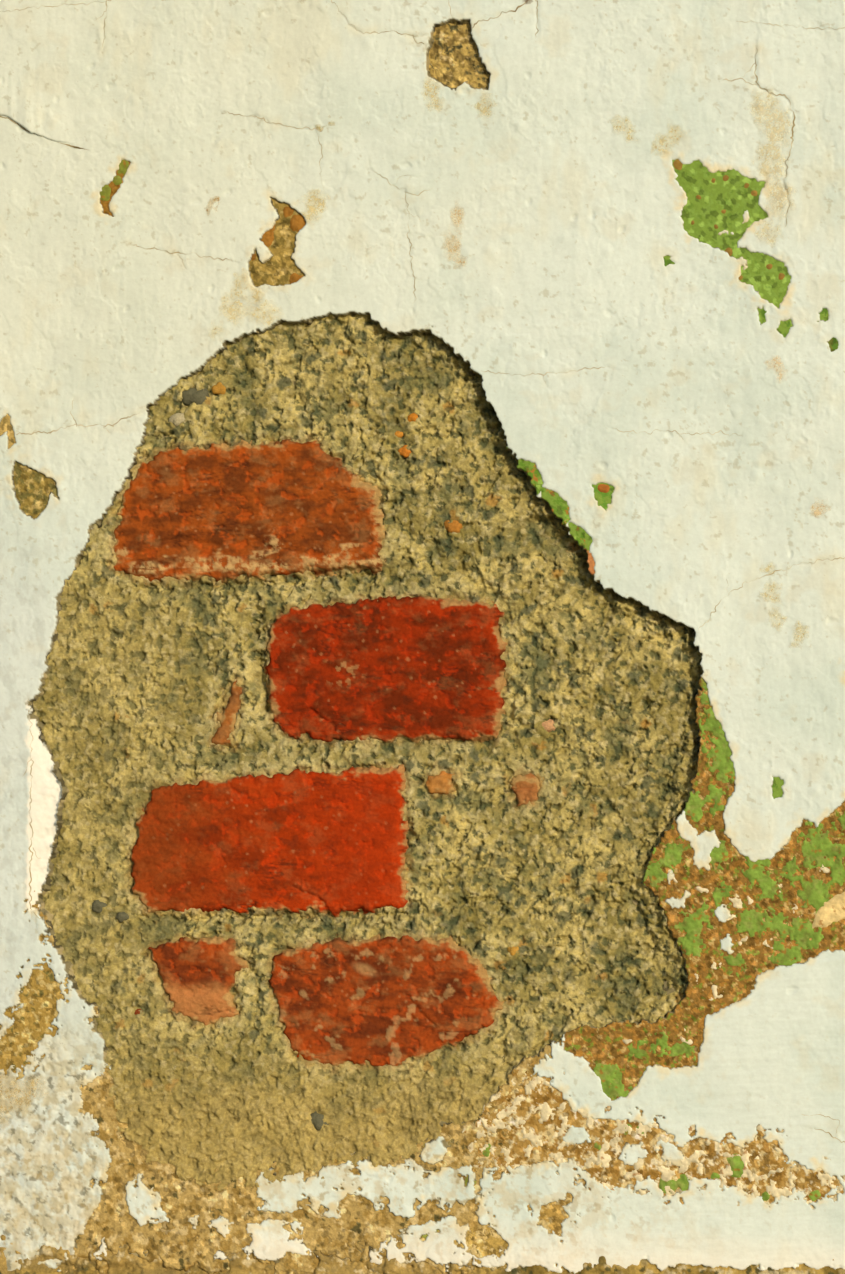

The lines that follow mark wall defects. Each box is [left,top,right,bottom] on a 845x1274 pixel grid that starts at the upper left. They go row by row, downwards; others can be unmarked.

crack [4,0,109,47]
crack [331,0,539,44]
peeling [429,22,490,88]
peeling [100,160,130,217]
crack [223,111,325,192]
crack [724,20,845,228]
crack [135,244,240,268]
peeling [249,198,306,286]
crack [378,174,428,312]
peeling [672,159,793,337]
crack [7,401,135,435]
spalling [0,314,845,1274]